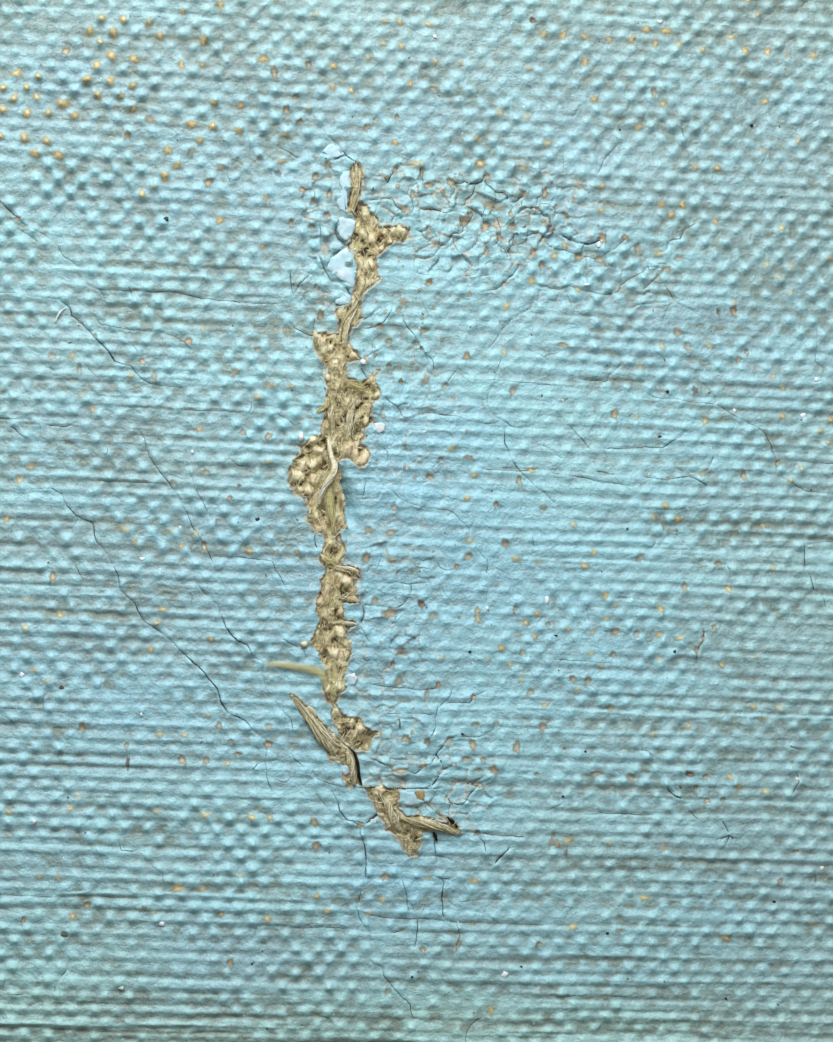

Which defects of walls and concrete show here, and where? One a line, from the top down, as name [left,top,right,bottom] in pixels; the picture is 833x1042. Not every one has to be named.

crack [361,162,695,387]
crack [46,297,212,411]
crack [385,397,454,418]
crack [47,488,98,543]
crack [134,432,172,487]
crack [188,492,284,584]
peeling [275,143,461,857]
crack [223,620,261,660]
crack [180,650,252,728]
crack [294,660,540,944]